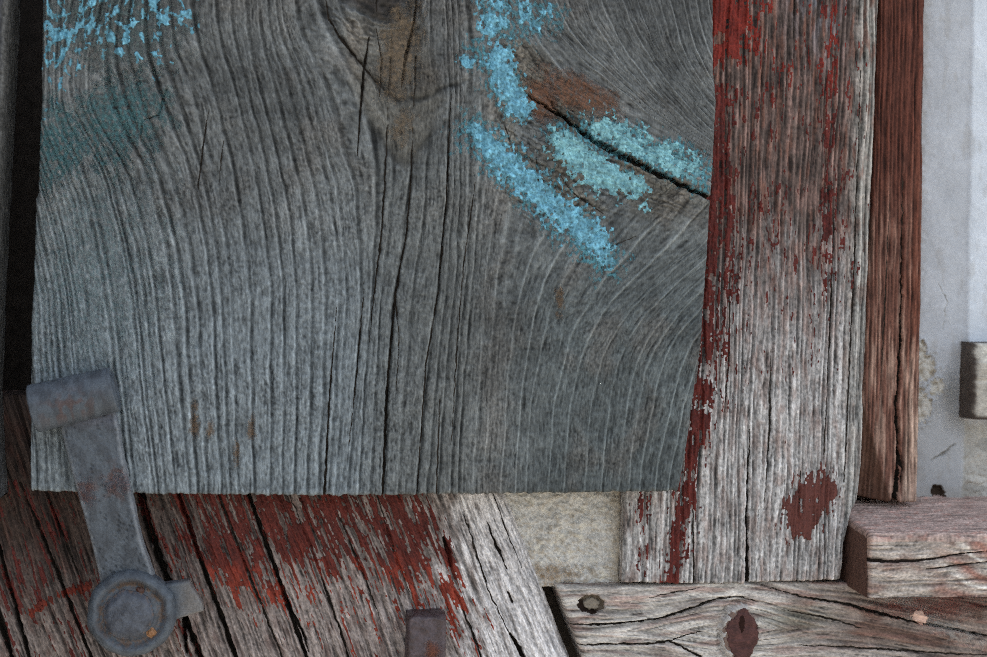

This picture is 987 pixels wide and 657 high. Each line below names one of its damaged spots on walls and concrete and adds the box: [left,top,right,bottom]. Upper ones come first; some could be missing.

peeling [42,0,200,121]
crack [530,97,708,199]
peeling [454,0,868,584]
crack [723,278,731,426]
peeling [0,479,100,657]
crack [568,357,987,657]